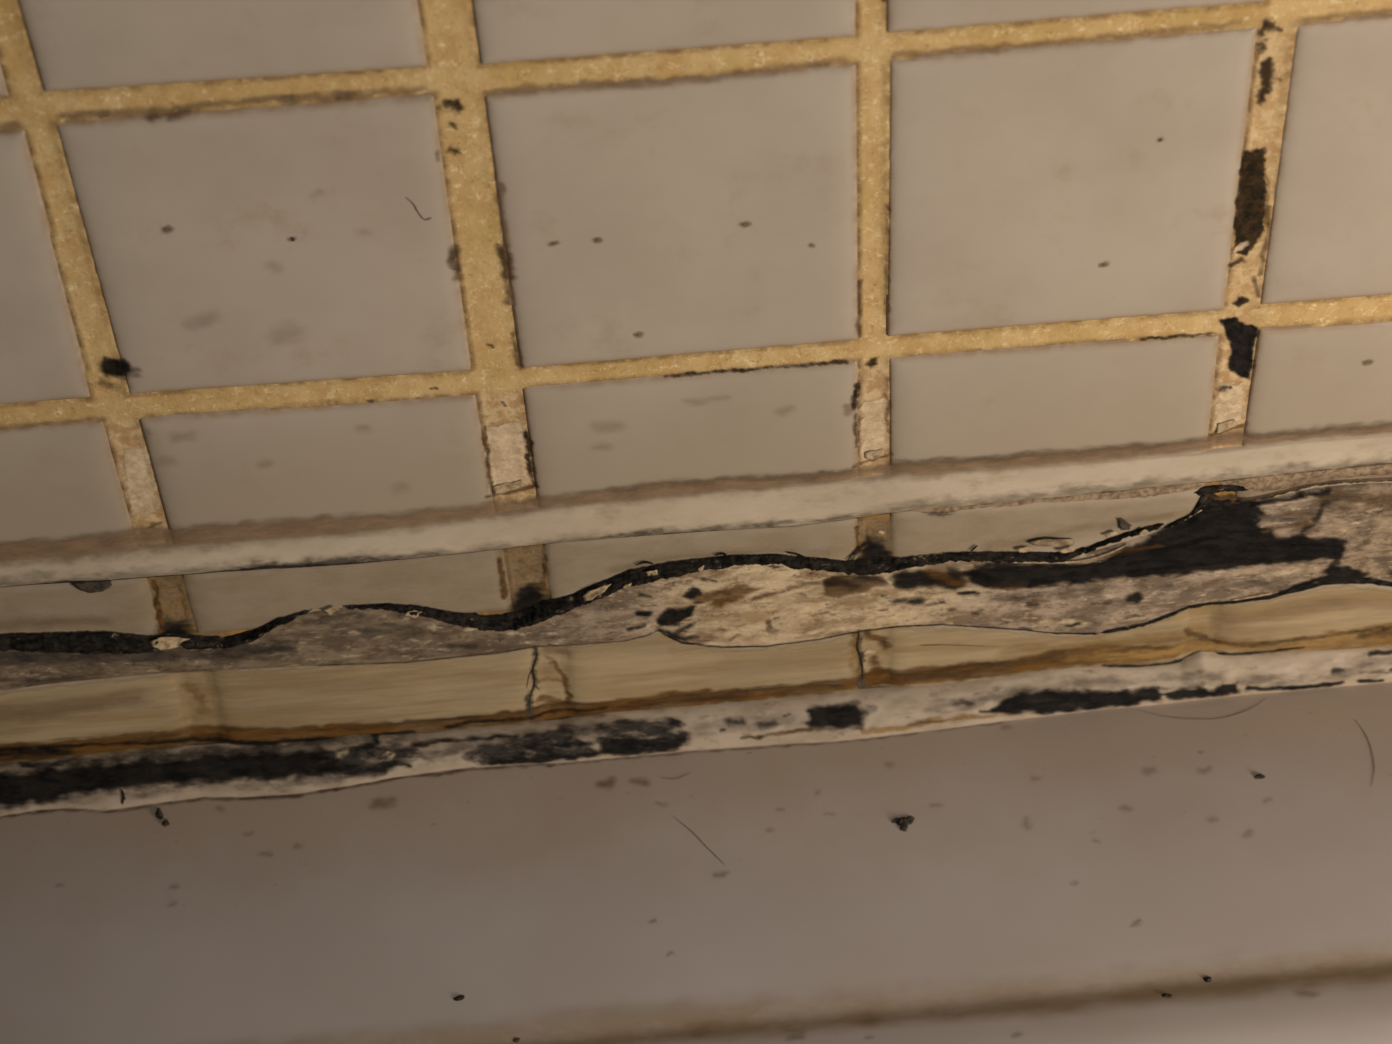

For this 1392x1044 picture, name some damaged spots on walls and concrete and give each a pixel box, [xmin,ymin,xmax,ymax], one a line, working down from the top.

water stain [1257,20,1283,104]
water stain [1141,148,1271,391]
water stain [664,360,848,377]
peeling [1105,519,1148,537]
peeling [72,581,112,593]
peeling [582,583,632,601]
peeling [149,637,189,650]
water stain [0,478,1392,808]
peeling [708,594,899,645]
crack [525,647,539,720]